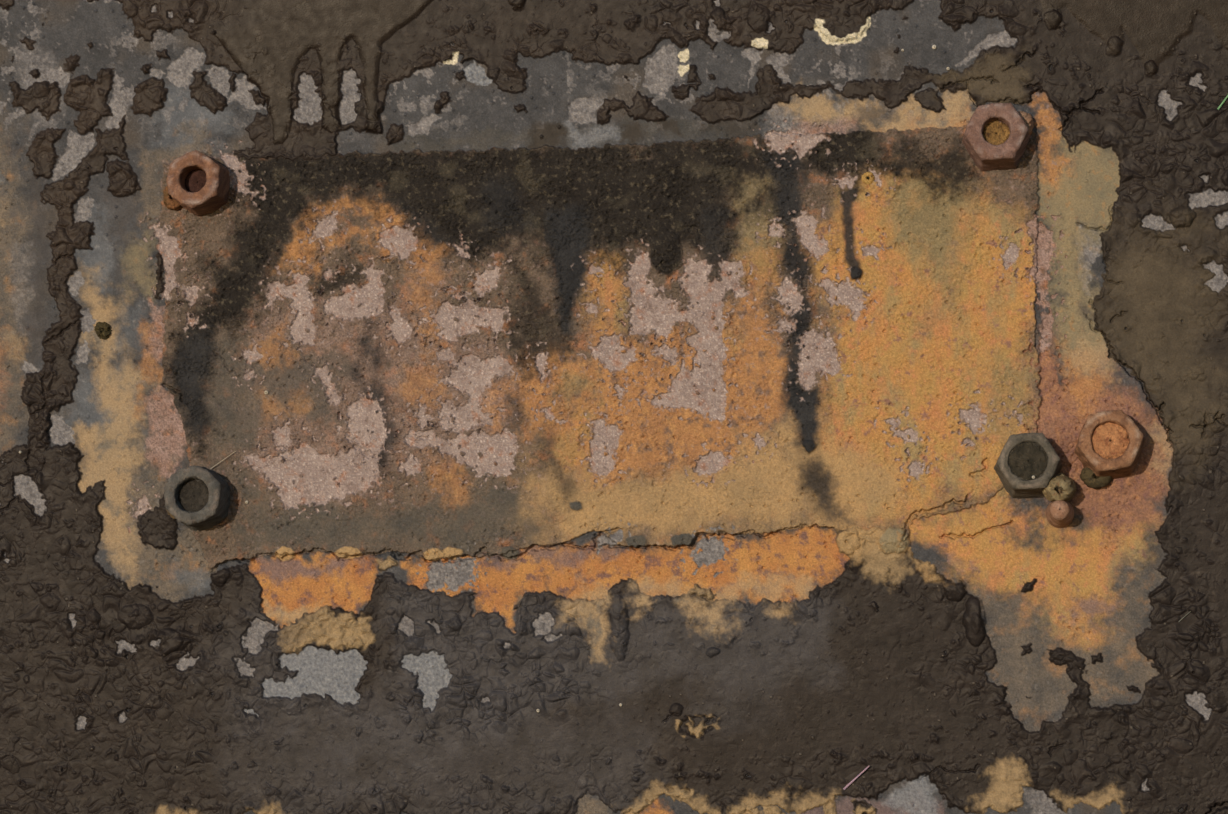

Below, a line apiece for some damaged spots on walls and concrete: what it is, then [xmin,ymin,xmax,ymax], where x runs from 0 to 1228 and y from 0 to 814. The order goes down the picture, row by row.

peeling [814,17,871,46]
peeling [568,44,716,126]
rust [0,96,48,456]
peeling [9,43,278,454]
rust [272,195,403,278]
rust [59,120,378,629]
rust [255,240,510,463]
rust [446,46,1228,664]
crack [903,454,1014,542]
crack [210,524,835,575]
peeling [234,617,371,705]
peeling [402,651,453,712]